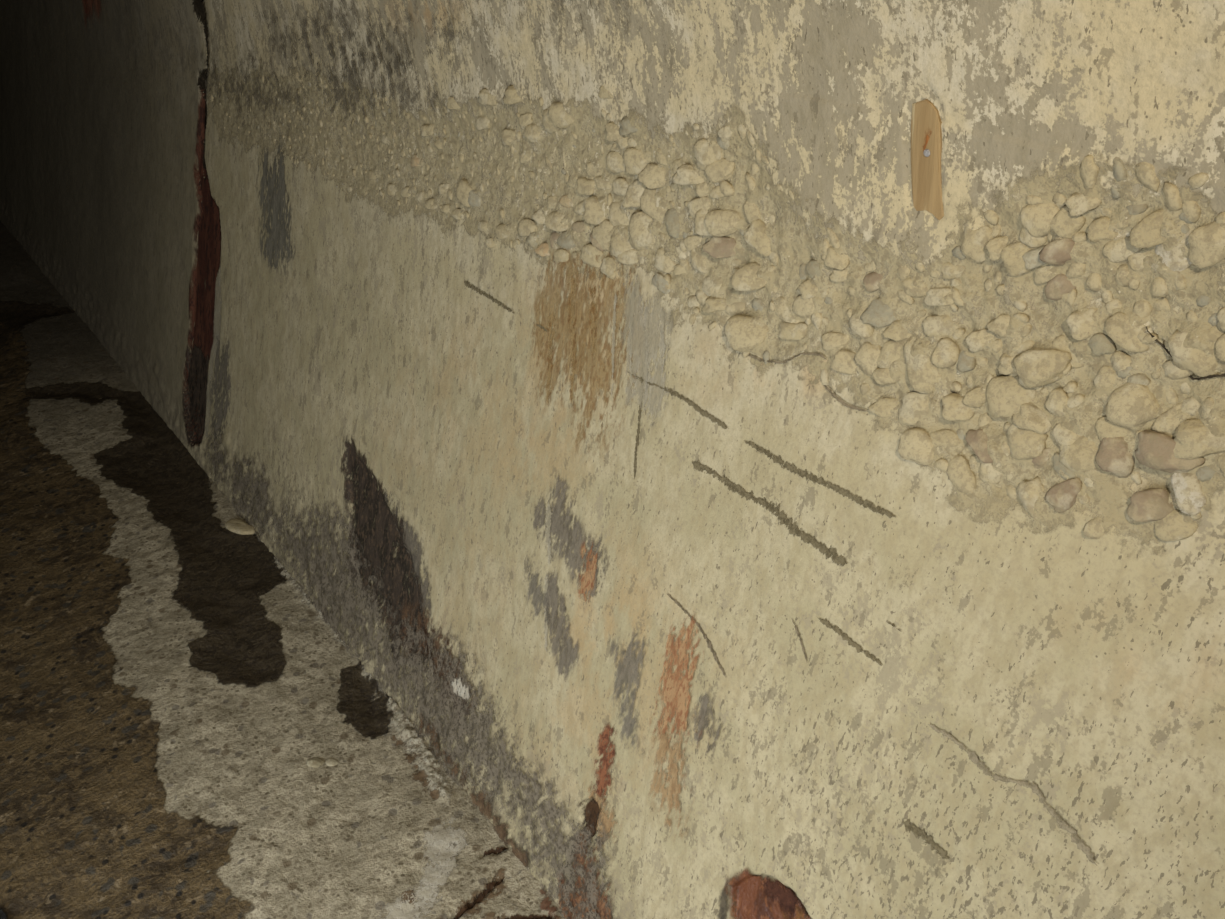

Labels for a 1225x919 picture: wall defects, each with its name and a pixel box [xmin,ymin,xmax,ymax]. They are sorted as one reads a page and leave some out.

corrosion [182,89,231,446]
corrosion [534,261,673,440]
damp [205,428,609,919]
peeling [928,724,1097,865]
corrosion [717,870,811,919]